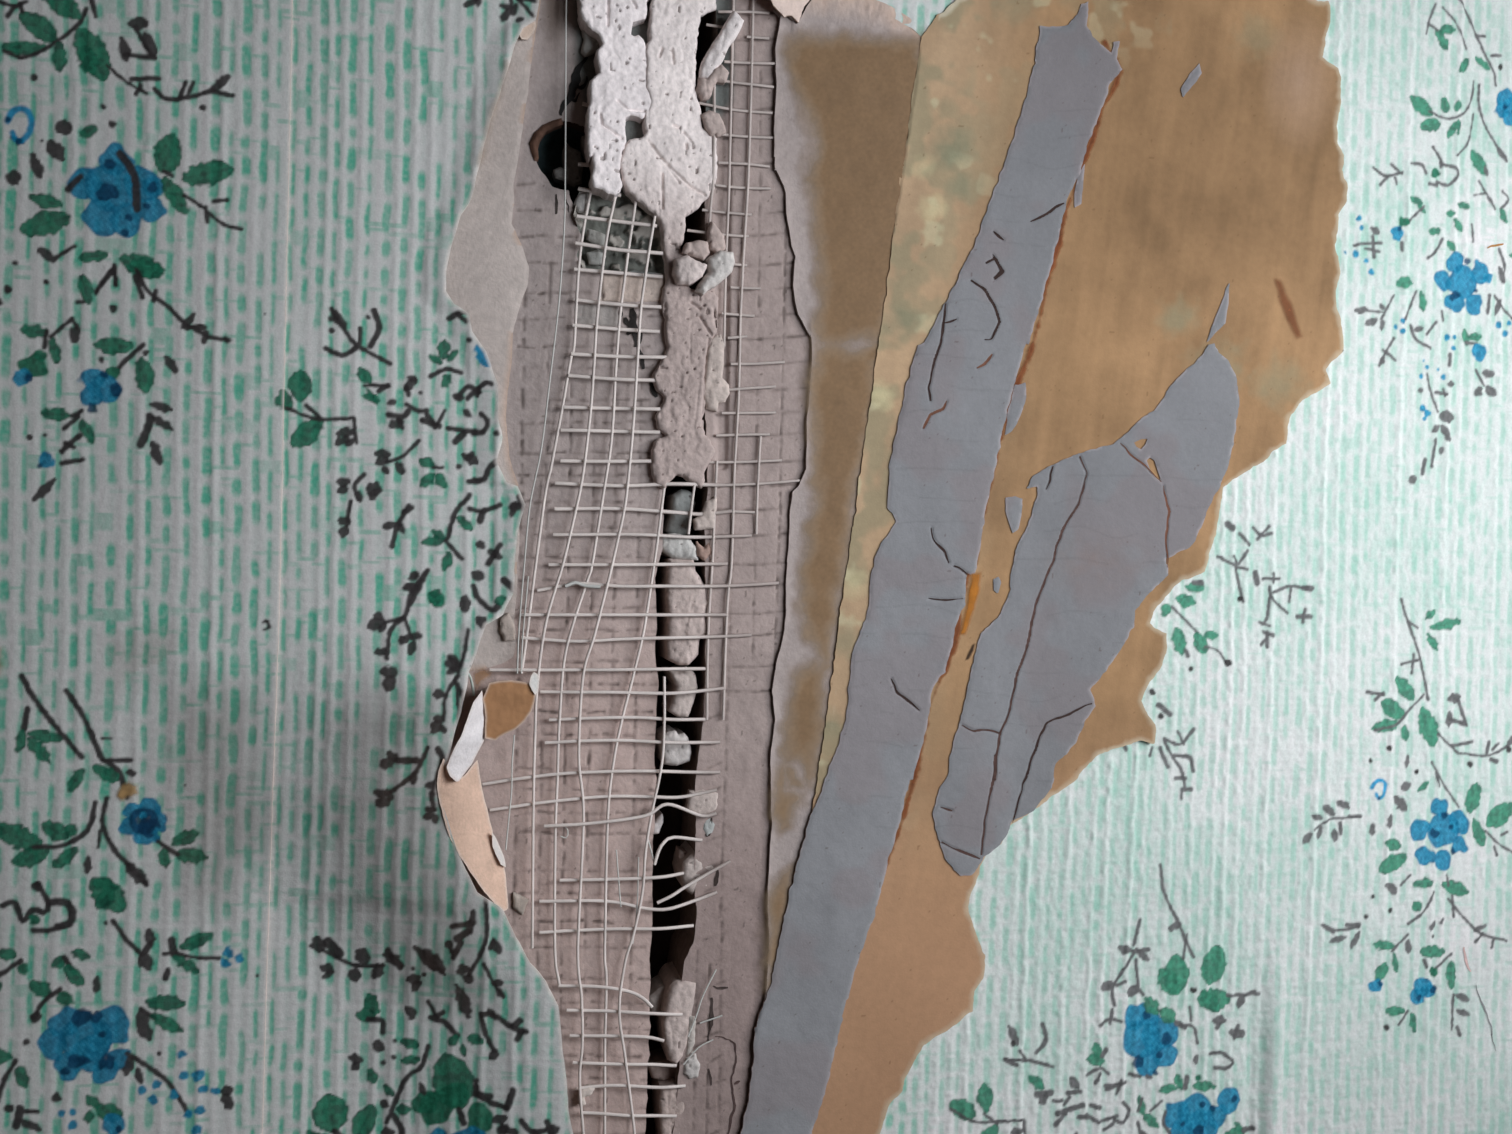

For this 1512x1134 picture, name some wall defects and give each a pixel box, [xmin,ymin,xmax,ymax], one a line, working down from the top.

crack [695,11,718,129]
peeling [446,0,541,486]
spalling [573,192,664,275]
crack [681,202,705,289]
crack [923,203,1064,429]
peeling [470,529,519,671]
crack [929,528,969,601]
peeling [740,0,1239,1134]
crack [941,456,1092,859]
crack [1120,443,1171,567]
crack [645,412,740,1134]